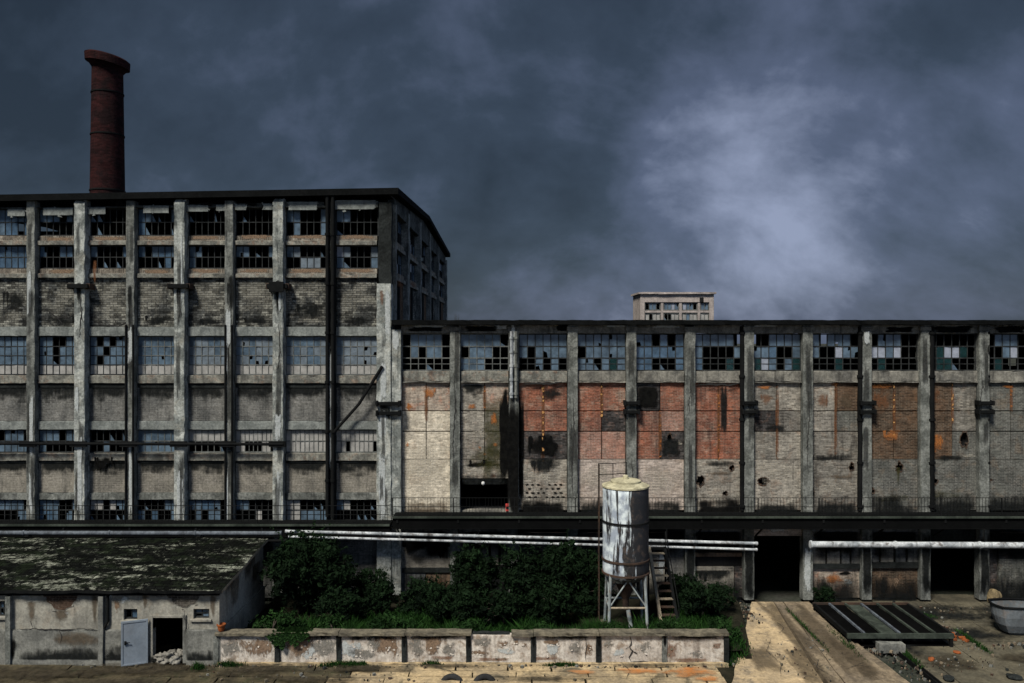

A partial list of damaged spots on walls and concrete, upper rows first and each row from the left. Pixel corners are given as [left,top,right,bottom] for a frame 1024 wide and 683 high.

damp [543,389,560,399]
damp [521,436,552,478]
damp [11,633,121,660]
peeling [220,636,455,659]